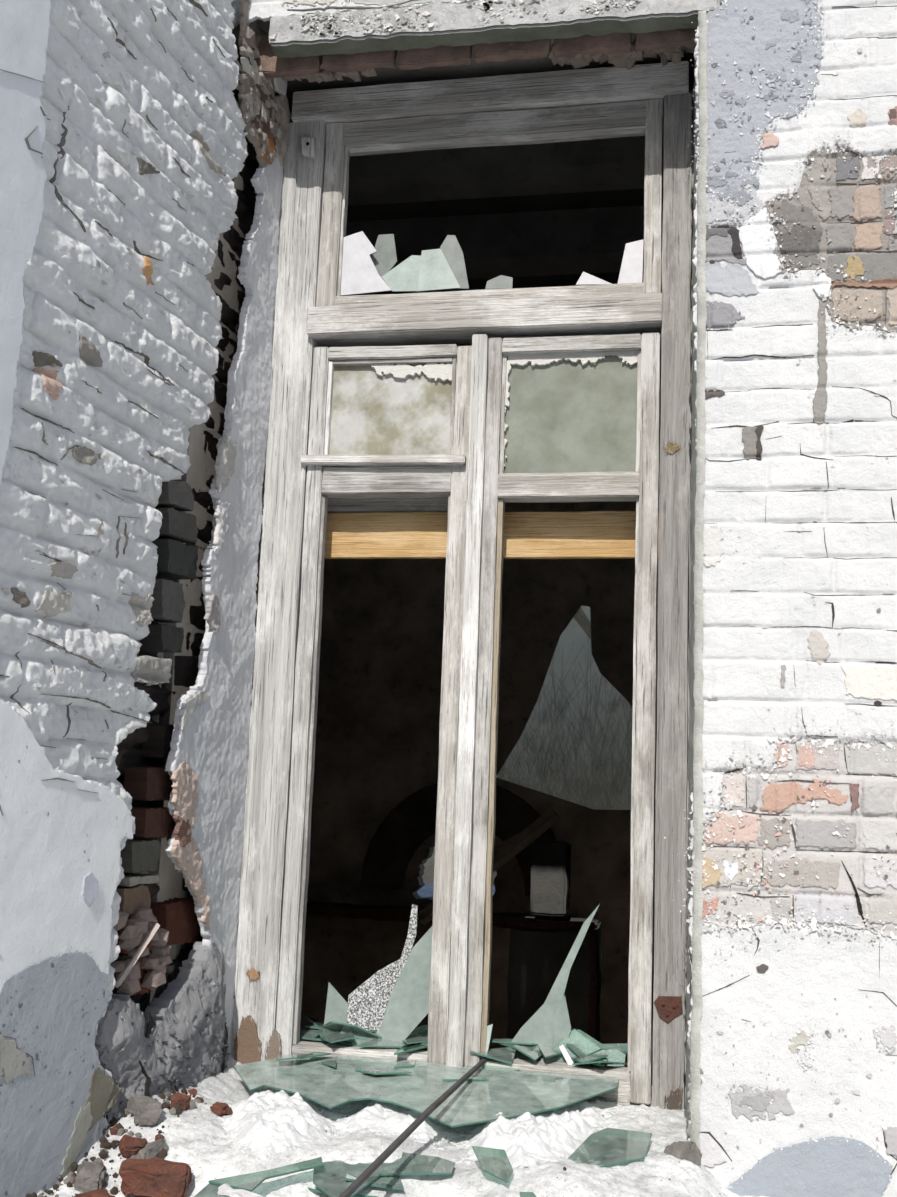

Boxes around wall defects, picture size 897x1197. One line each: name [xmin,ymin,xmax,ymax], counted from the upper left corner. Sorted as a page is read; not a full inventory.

peeling [351,0,452,8]
crack [0,69,83,223]
peeling [696,0,897,333]
crack [255,463,266,627]
crack [715,386,897,559]
flaking render [702,738,897,938]
spalling [144,956,230,1092]
crack [221,996,235,1073]